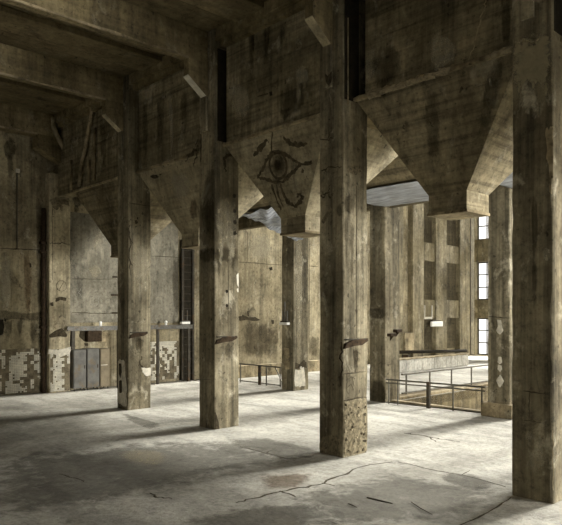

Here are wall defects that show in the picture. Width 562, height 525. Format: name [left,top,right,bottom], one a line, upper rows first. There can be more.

crack [338,342,367,401]
spalling [319,398,367,457]
crack [236,462,511,525]